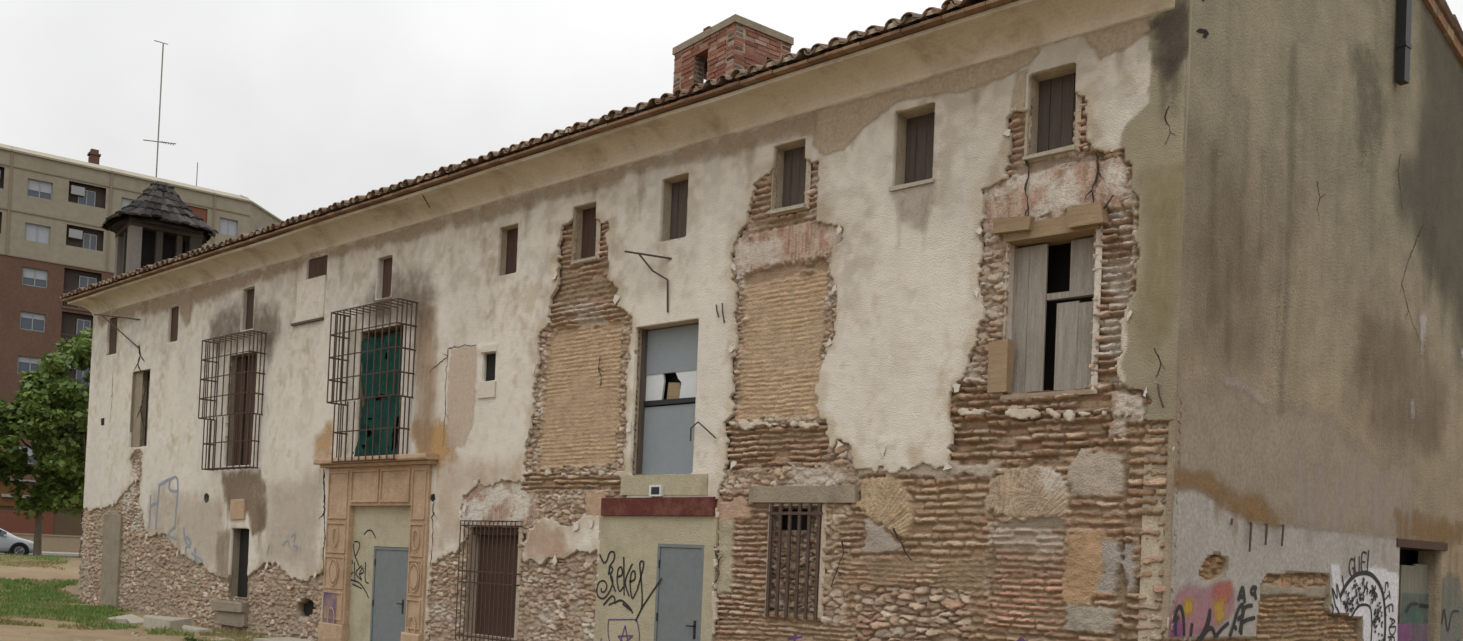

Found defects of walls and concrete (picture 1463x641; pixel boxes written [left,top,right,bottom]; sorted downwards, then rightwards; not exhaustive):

peeling [1056,16,1151,59]
damp [1402,17,1463,313]
spalling [78,446,324,641]
spalling [427,210,644,641]
spalling [714,47,1358,641]